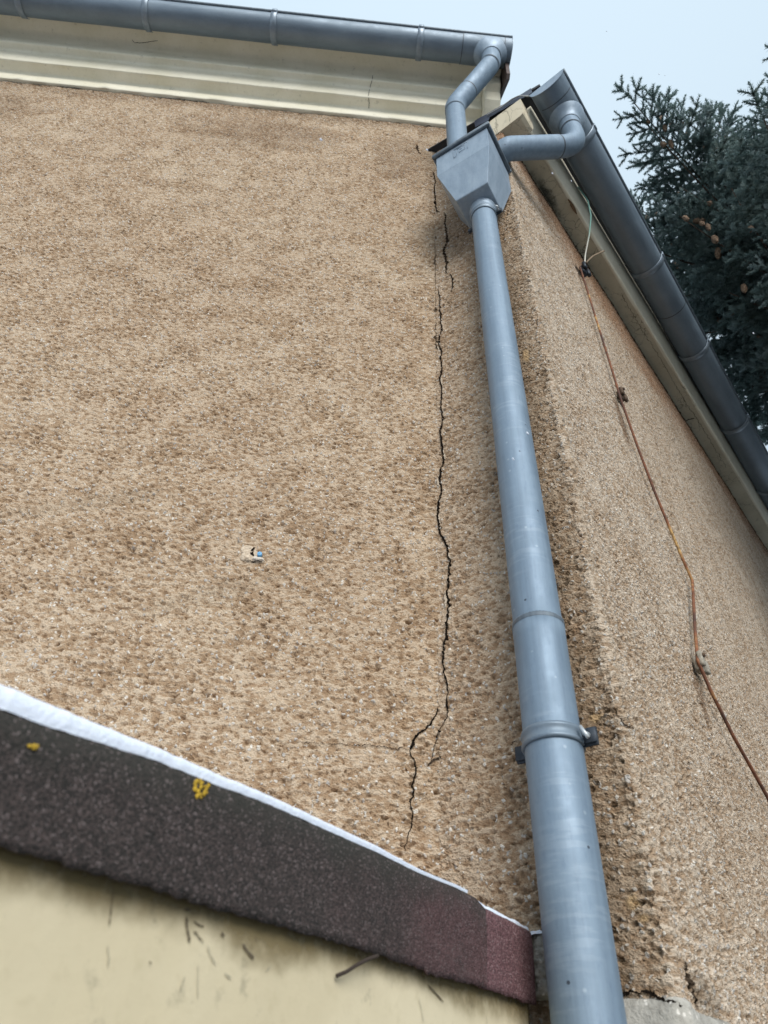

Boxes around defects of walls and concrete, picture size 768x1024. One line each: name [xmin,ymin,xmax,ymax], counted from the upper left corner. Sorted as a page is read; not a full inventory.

crack [277,145,454,851]